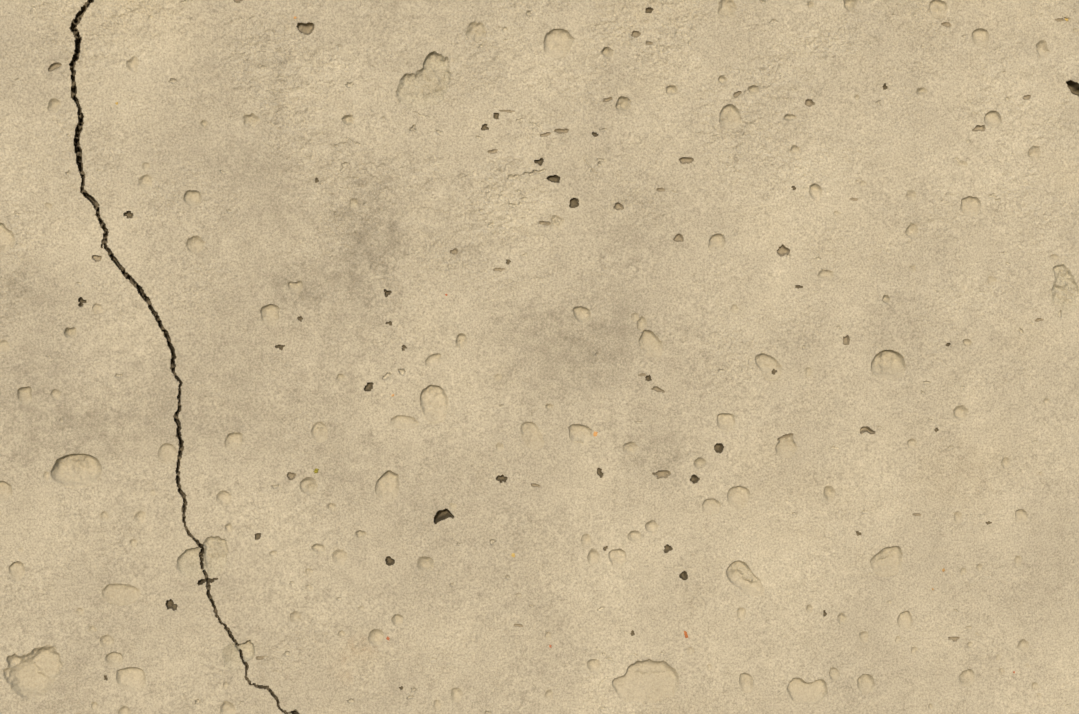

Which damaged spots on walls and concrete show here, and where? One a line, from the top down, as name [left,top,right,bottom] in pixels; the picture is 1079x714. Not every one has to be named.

crack [69,0,299,714]